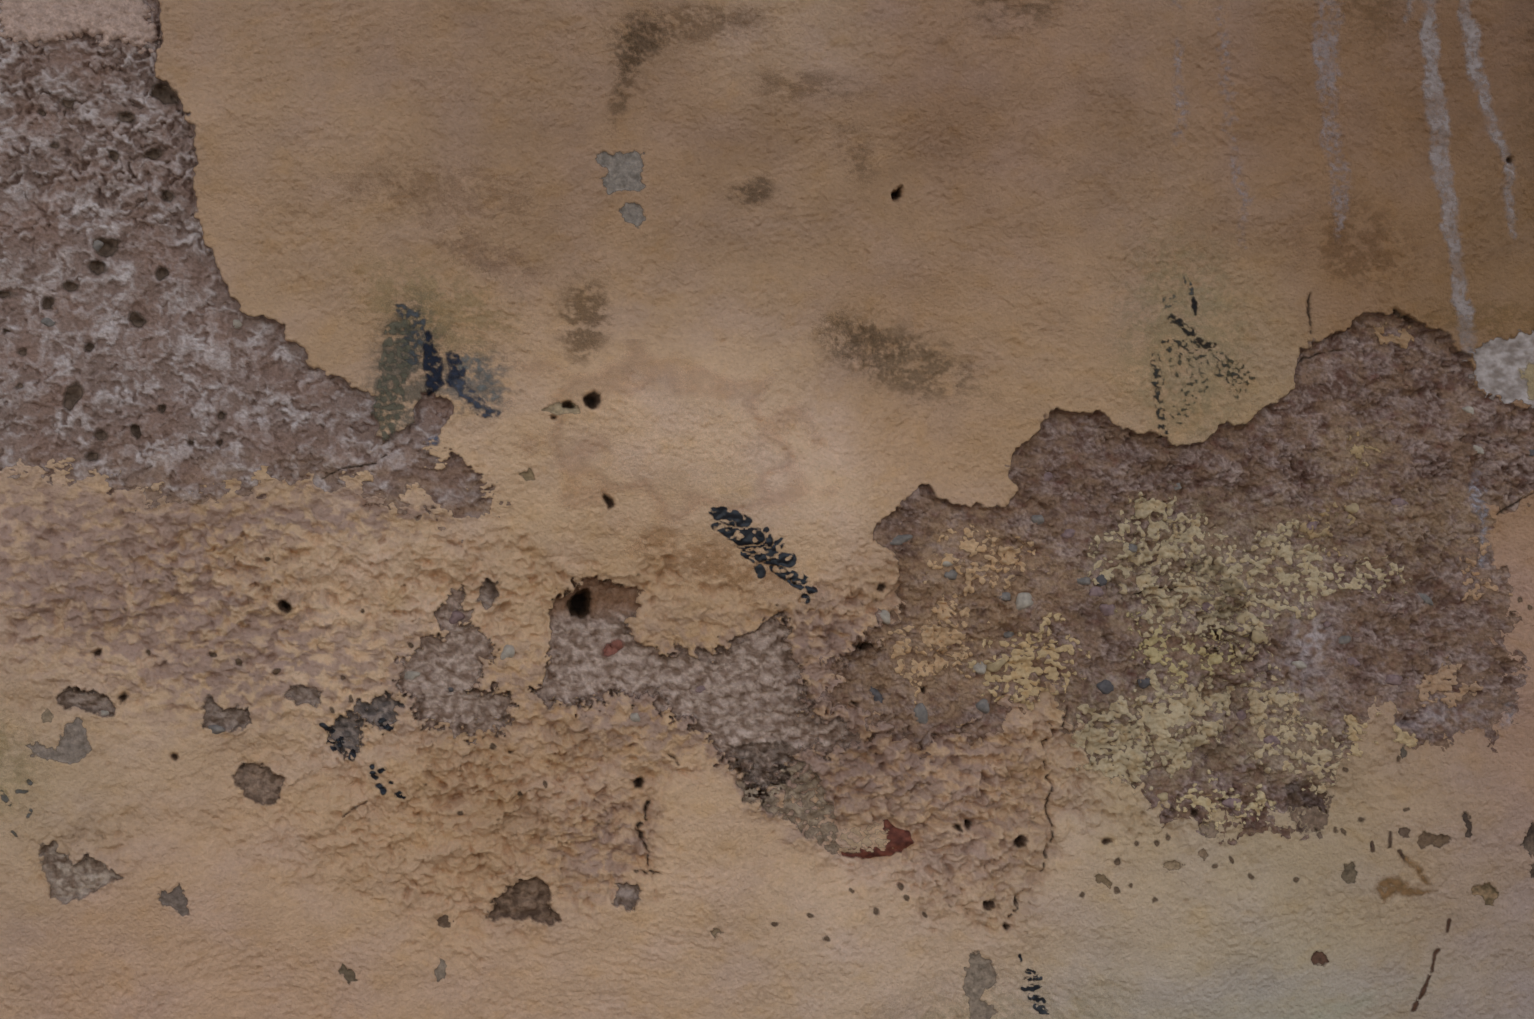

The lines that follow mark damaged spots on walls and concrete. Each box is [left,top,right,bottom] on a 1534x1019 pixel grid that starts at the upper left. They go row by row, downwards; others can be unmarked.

water stain [1420,13,1443,97]
water stain [1461,13,1491,112]
water stain [1429,112,1460,257]
spalling [0,0,511,531]
water stain [1452,275,1474,324]
spalling [530,312,1534,878]
spalling [327,578,519,759]
peeling [26,687,115,764]
spalling [202,697,251,734]
spalling [233,763,284,805]
spalling [39,841,123,904]
spalling [489,877,561,925]